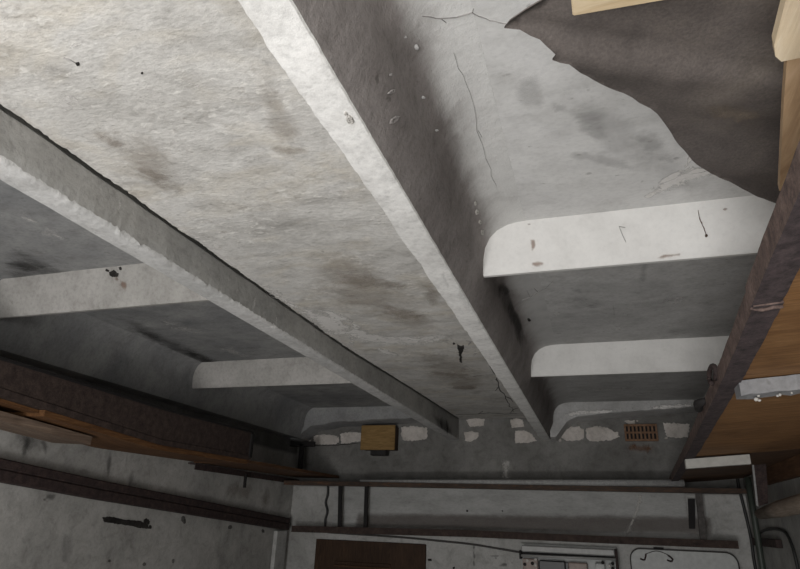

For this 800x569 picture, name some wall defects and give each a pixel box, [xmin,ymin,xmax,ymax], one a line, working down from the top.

crack [422,8,506,24]
crack [480,366,517,414]
peeling [309,432,361,445]
peeling [401,426,428,441]
peeling [464,418,485,442]
peeling [510,418,537,443]
peeling [559,426,620,442]
peeling [663,422,690,439]